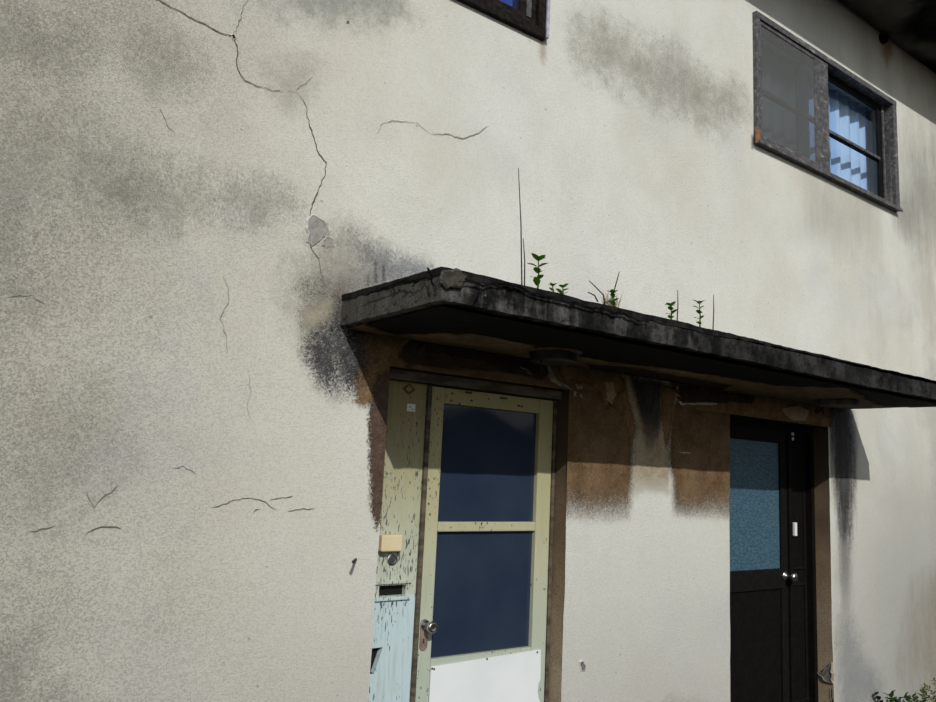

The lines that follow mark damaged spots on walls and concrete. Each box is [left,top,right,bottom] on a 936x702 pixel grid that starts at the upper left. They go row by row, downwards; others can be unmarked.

crack [160,0,327,215]
crack [378,120,487,139]
spalling [305,214,335,249]
peeling [399,340,583,398]
leakage [303,242,936,535]
peeling [589,364,755,405]
crack [211,495,314,511]